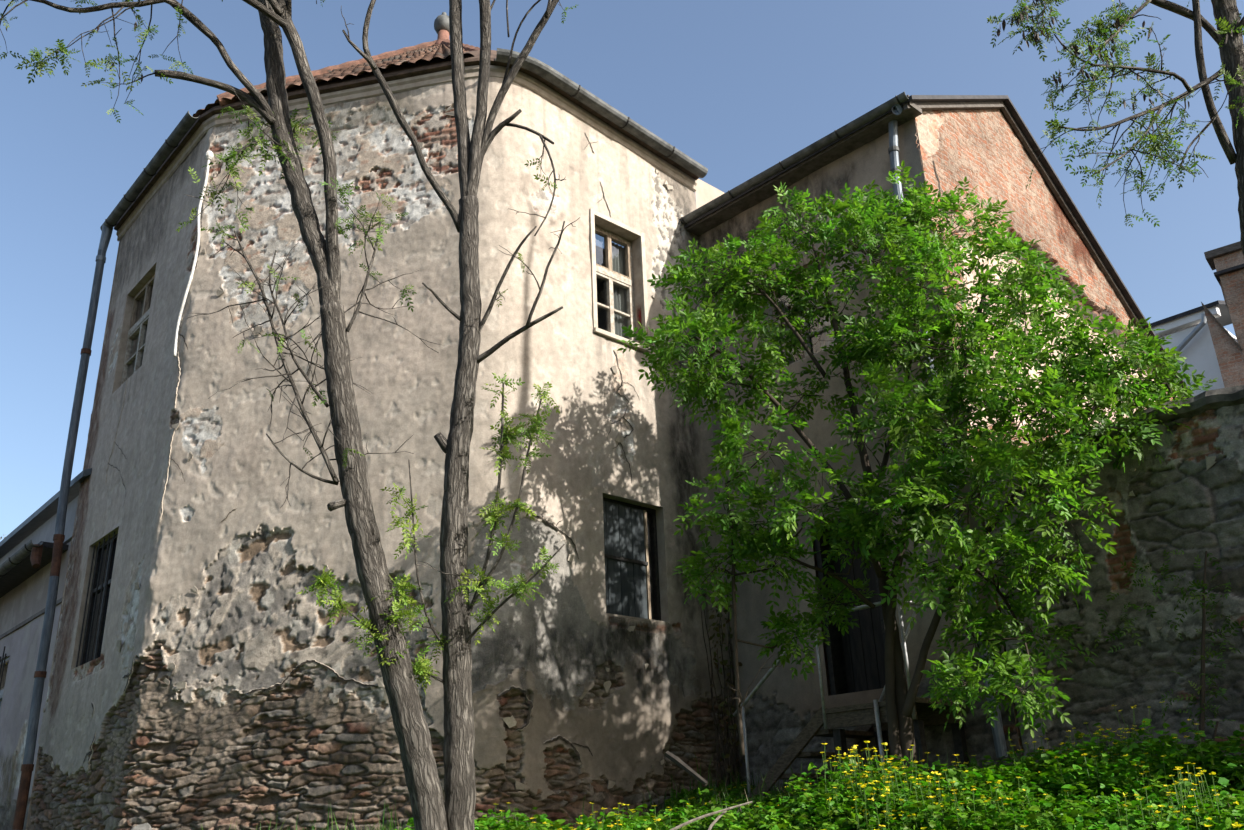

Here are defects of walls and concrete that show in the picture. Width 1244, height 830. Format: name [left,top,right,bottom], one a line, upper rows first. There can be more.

peeling [186,118,317,343]
peeling [289,96,474,251]
peeling [651,167,685,315]
crack [608,351,640,481]
flaking render [1103,413,1244,597]
flaking render [0,525,414,830]
peeling [389,570,445,807]
peeling [467,504,891,829]
flaking render [916,653,1022,772]
flaking render [1032,613,1244,765]